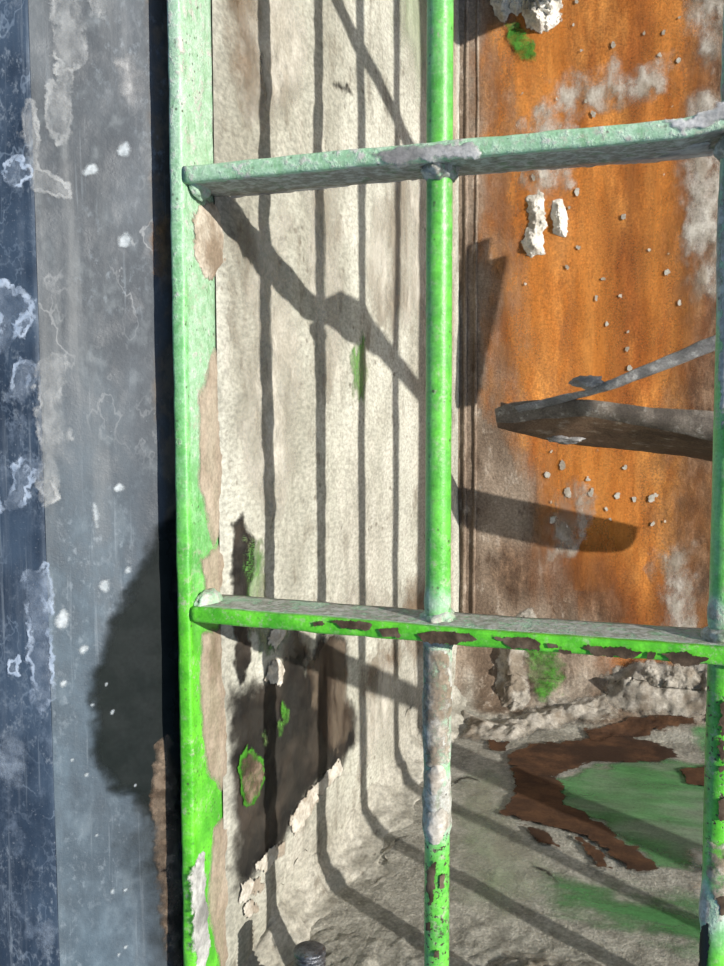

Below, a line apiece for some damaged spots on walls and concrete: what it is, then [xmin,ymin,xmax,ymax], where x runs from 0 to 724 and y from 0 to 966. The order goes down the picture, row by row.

rust [488,0,699,137]
damp [3,155,33,187]
damp [0,279,34,337]
rust [503,160,690,408]
peeling [231,515,255,596]
rust [521,434,677,627]
peeling [229,620,401,919]
rust [149,736,184,966]
peeling [698,923,710,966]